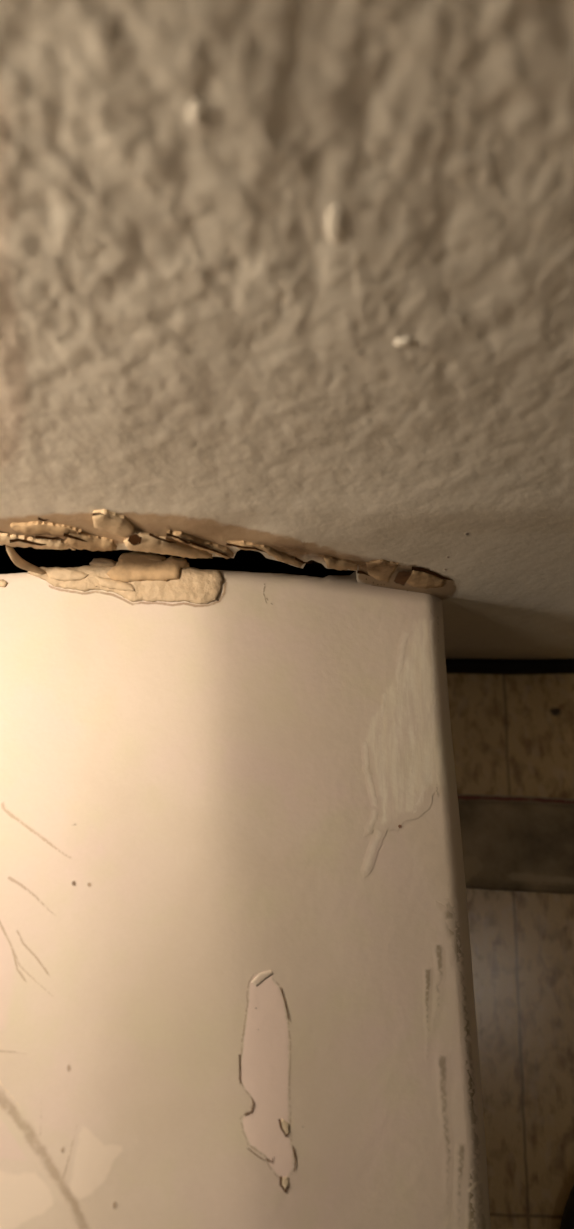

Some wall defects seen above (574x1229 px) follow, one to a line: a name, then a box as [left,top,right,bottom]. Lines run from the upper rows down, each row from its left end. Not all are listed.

crack [0,544,370,611]
peeling [0,508,459,608]
crack [411,567,452,580]
peeling [238,968,303,1193]